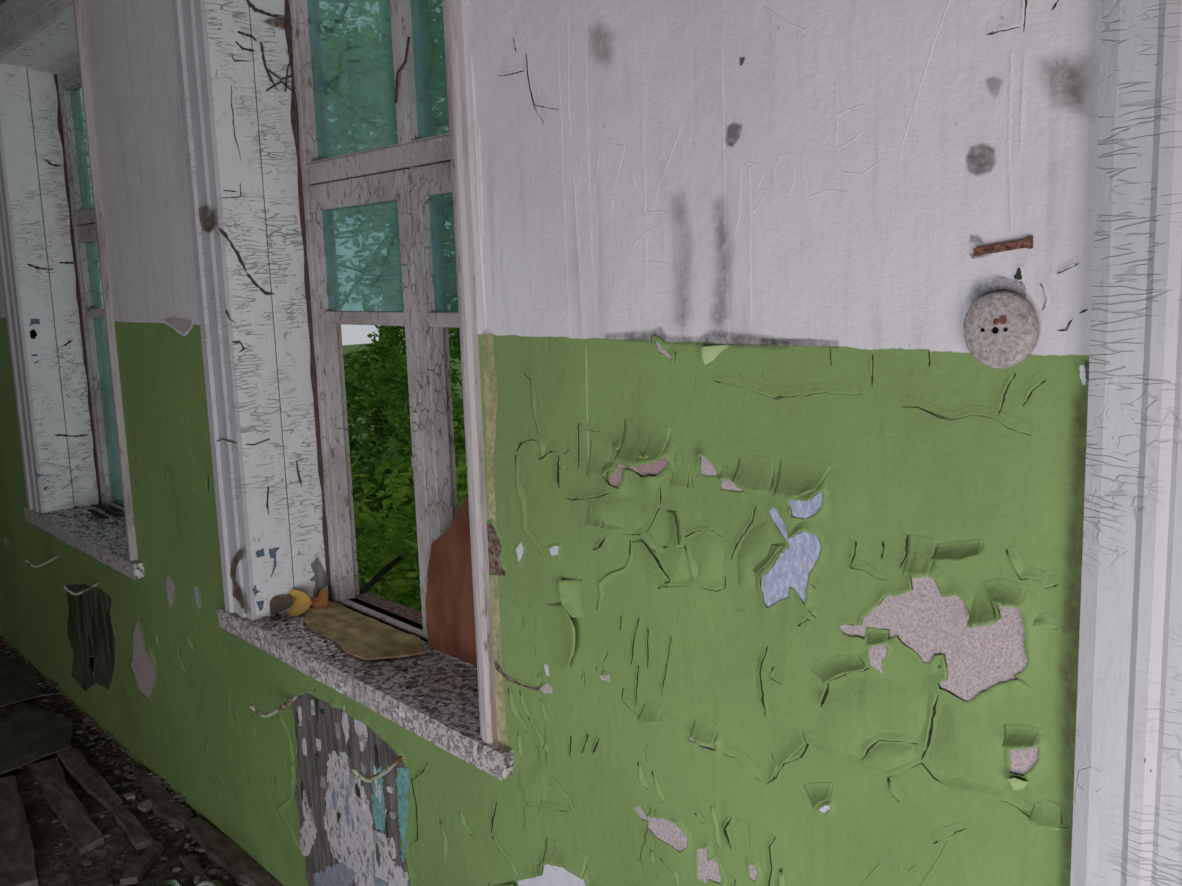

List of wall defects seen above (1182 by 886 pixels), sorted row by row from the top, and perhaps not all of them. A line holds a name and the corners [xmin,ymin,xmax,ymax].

corrosion [971,236,1033,258]
peeling [700,344,734,365]
spalling [1079,363,1089,385]
spalling [486,519,528,580]
peeling [594,418,833,619]
flaking render [63,579,159,704]
peeling [494,579,585,697]
peeling [811,539,1051,718]
flaking render [287,681,417,886]
peeling [1000,724,1061,831]
peeling [493,838,609,886]
peeling [632,800,729,886]